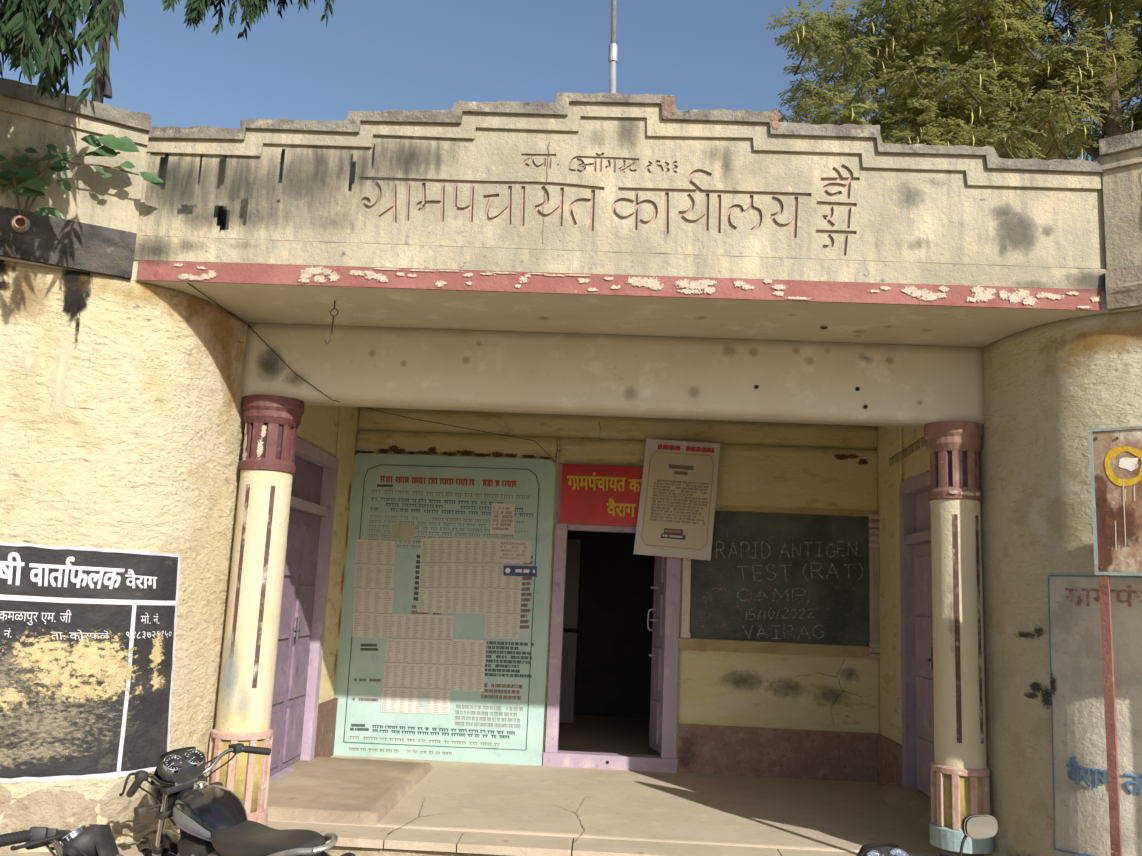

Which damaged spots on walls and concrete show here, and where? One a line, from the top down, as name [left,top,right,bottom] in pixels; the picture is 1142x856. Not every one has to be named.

damp [999,210,1031,247]
damp [0,260,34,302]
damp [62,269,92,342]
peeling [298,266,717,294]
peeling [734,278,812,300]
peeling [242,424,267,460]
damp [1016,627,1044,639]
damp [1024,674,1056,709]